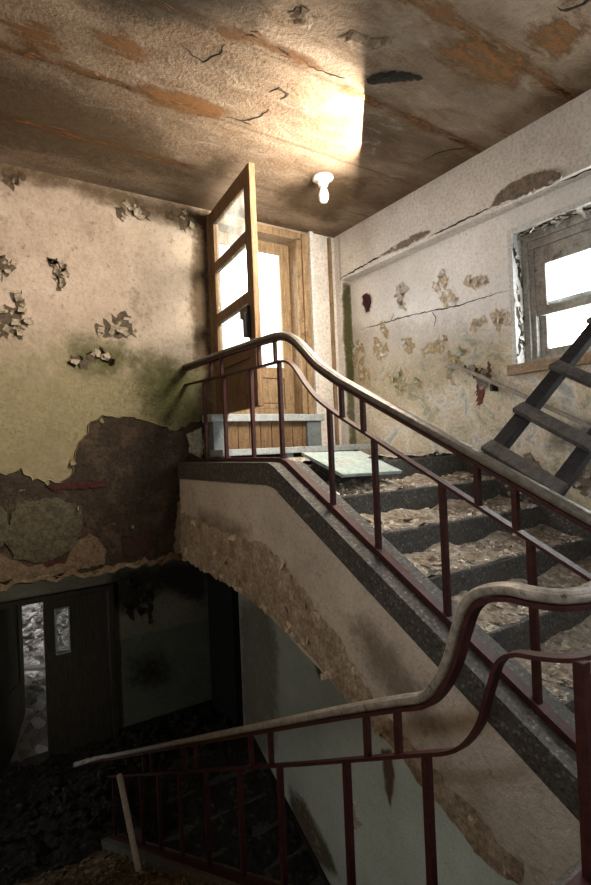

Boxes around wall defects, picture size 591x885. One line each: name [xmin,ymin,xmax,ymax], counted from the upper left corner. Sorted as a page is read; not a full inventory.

water stain [101,0,262,21]
rust [398,0,589,100]
water stain [0,75,188,176]
rust [341,85,481,154]
water stain [280,176,355,221]
spalling [490,168,563,208]
peeling [0,289,35,340]
peeling [46,257,70,291]
peeling [68,311,137,370]
water stain [0,162,211,426]
spalling [361,293,373,313]
spalling [0,414,374,703]